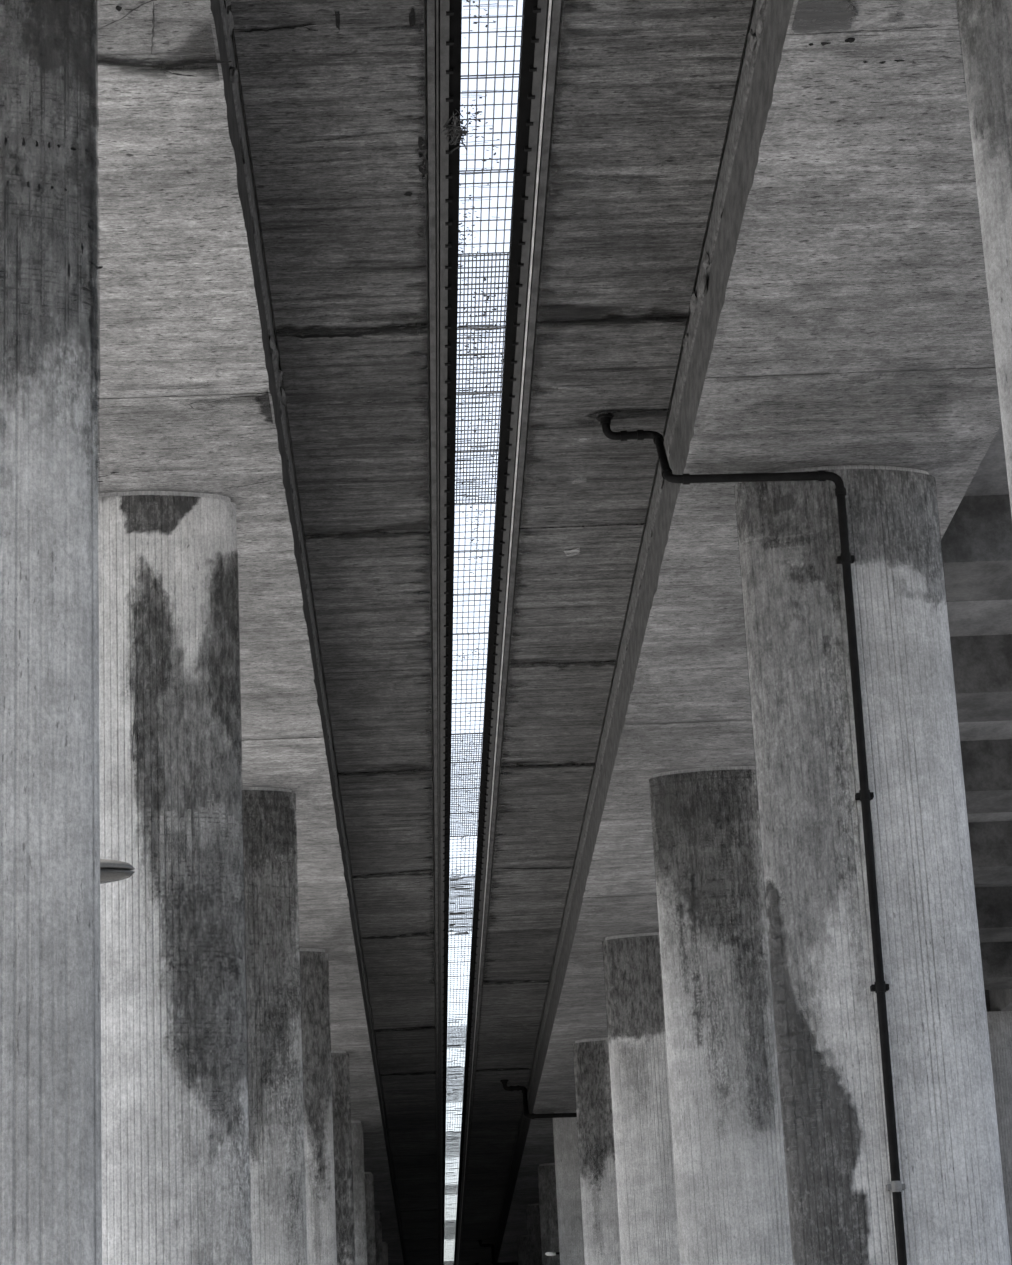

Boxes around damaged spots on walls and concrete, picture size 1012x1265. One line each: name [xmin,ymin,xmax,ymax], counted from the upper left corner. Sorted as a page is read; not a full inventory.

damp [0,0,219,469]
damp [130,557,382,1265]
damp [573,935,665,1180]
damp [649,482,869,1265]